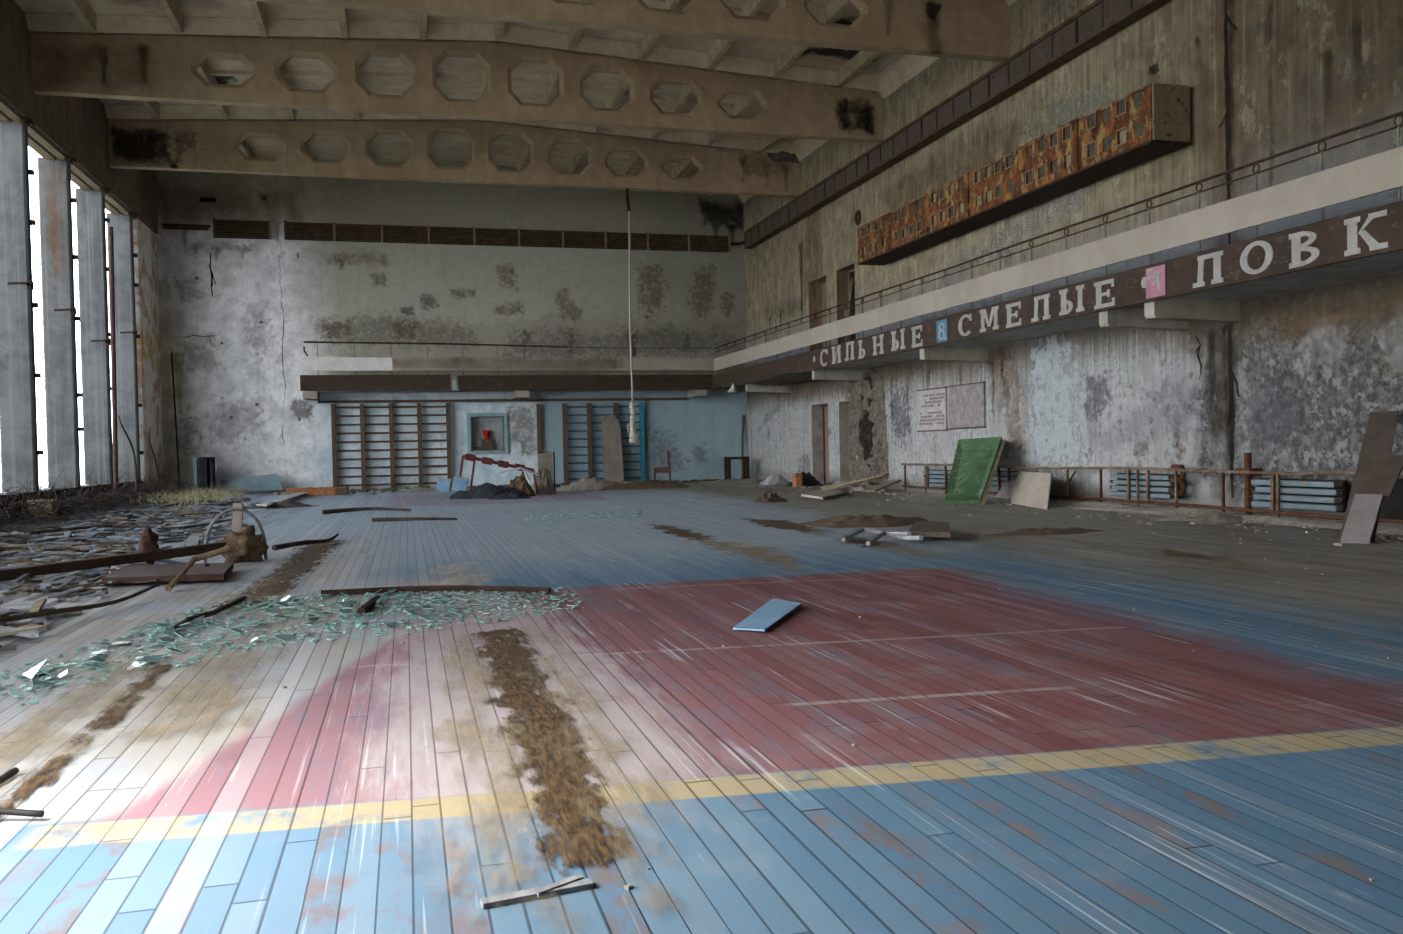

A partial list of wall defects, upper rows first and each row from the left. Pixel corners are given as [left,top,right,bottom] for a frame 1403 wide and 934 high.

leakage [835,100,875,135]
leakage [110,127,175,165]
leakage [699,197,744,231]
crack [208,253,216,297]
peeling [401,295,439,315]
peeling [1022,333,1110,476]
spalling [859,385,910,468]